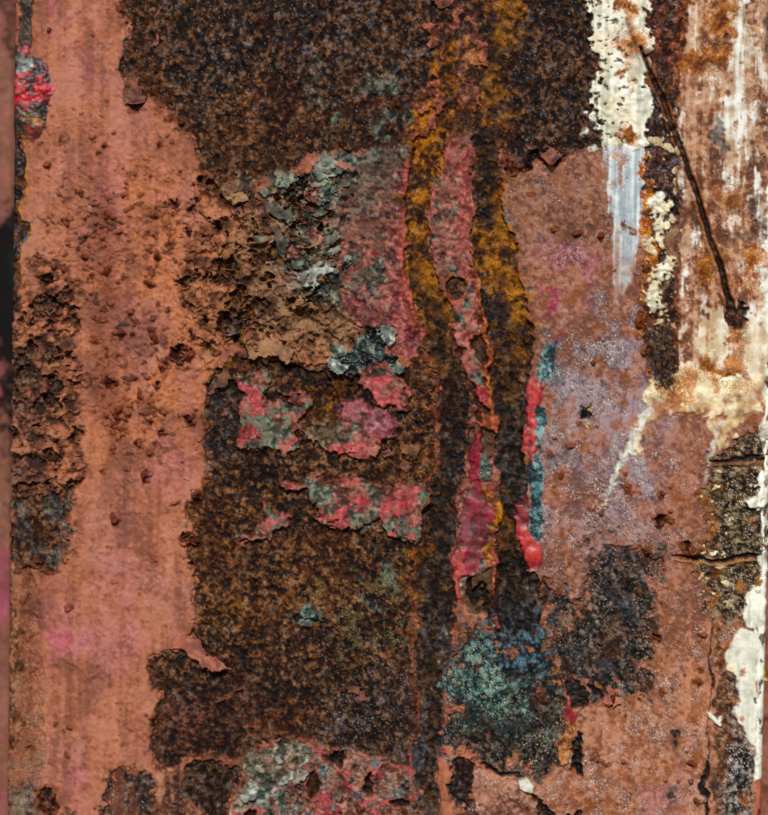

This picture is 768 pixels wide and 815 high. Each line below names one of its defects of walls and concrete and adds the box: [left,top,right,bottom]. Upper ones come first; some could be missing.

rust [742,87,768,114]
peeling [233,140,427,461]
rust [113,0,756,409]
rust [728,238,768,297]
rust [133,427,175,458]
rust [146,348,441,773]
peeling [181,738,422,815]
peeling [278,472,432,546]
spalling [427,111,666,813]
crack [698,618,716,815]
crack [671,553,767,565]
spalling [692,427,768,815]